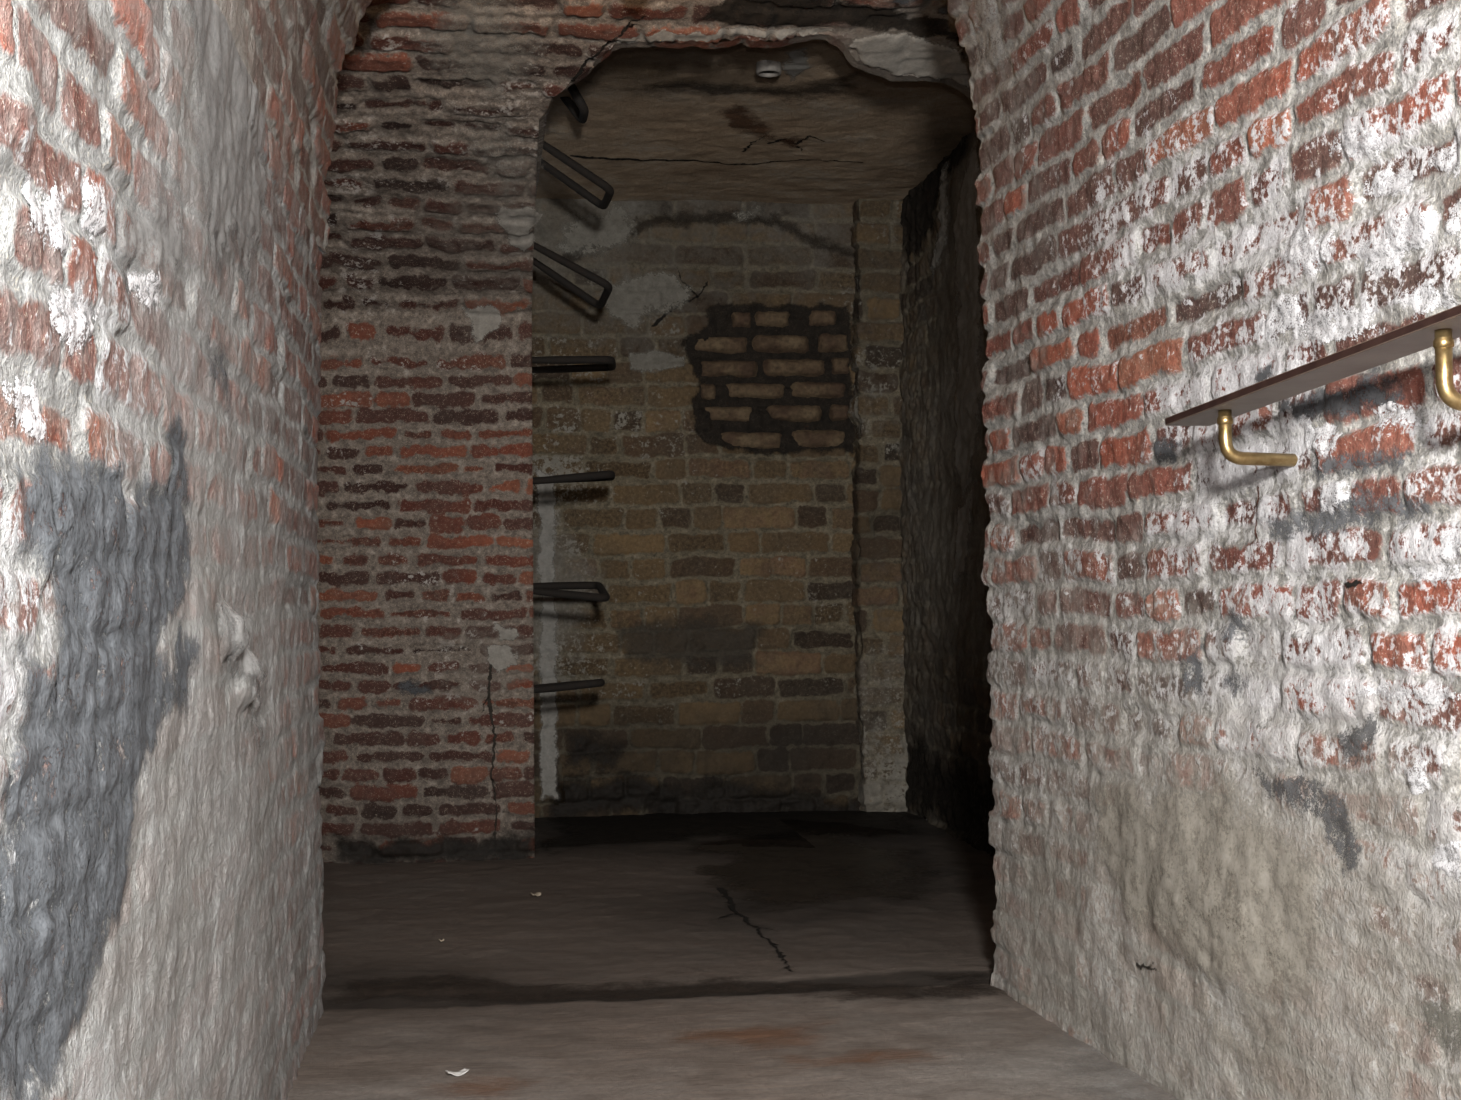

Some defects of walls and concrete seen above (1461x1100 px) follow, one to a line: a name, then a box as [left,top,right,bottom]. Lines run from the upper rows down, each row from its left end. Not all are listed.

damp [167,413,191,511]
damp [174,622,200,711]
crack [483,664,499,840]
crack [713,888,791,971]